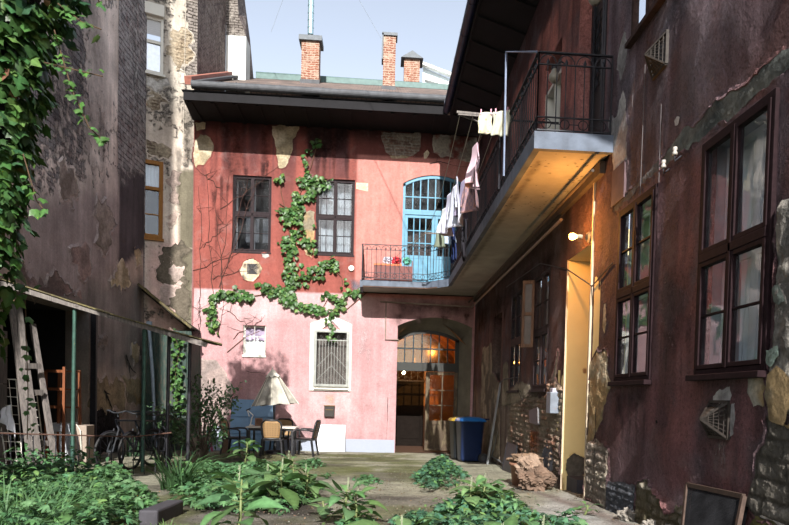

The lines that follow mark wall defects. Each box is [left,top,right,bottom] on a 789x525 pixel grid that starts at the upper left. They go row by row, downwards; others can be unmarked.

flaking render [146,26,196,112]
peeling [674,46,787,133]
peeling [57,156,80,212]
peeling [146,139,183,229]
peeling [192,121,215,168]
peeling [270,125,300,170]
peeling [380,131,479,164]
peeling [12,194,132,304]
peeling [154,240,192,321]
flaking render [712,199,789,525]
flaking render [480,338,689,525]